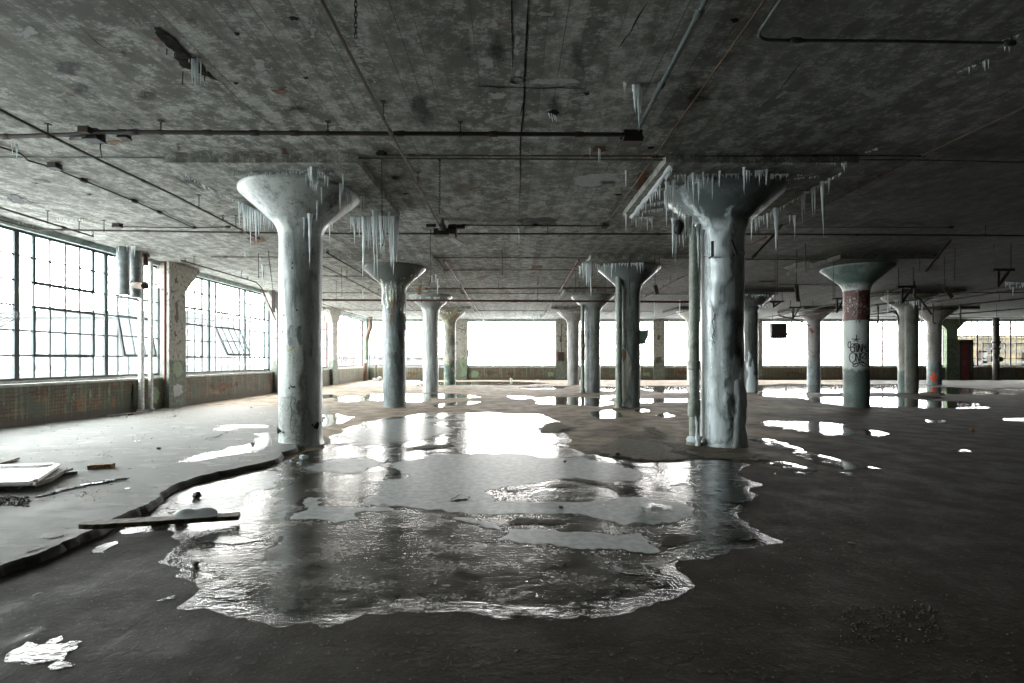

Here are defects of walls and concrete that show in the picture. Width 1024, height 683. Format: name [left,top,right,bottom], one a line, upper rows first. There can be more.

spalling [154,27,219,85]